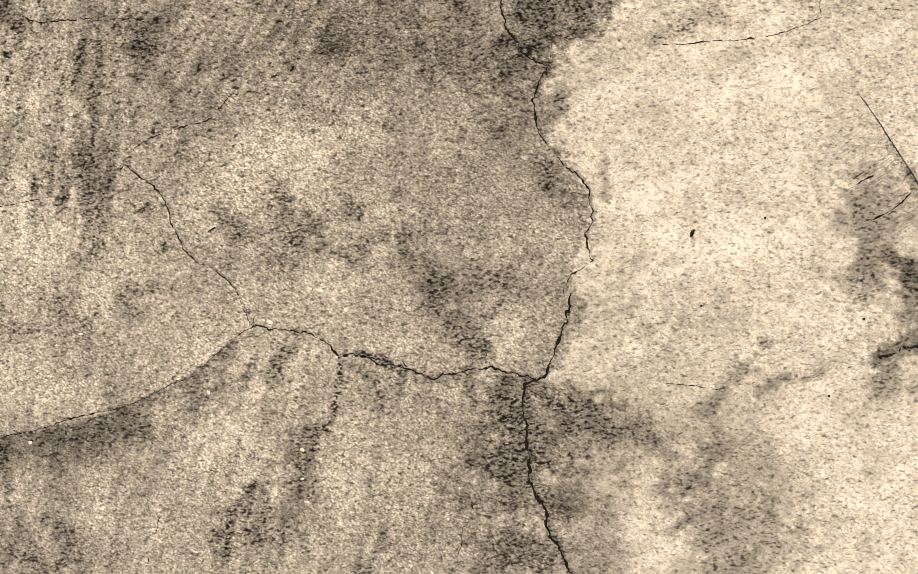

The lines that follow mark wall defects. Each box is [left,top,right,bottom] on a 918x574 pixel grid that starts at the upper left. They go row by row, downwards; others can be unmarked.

crack [1,0,597,574]